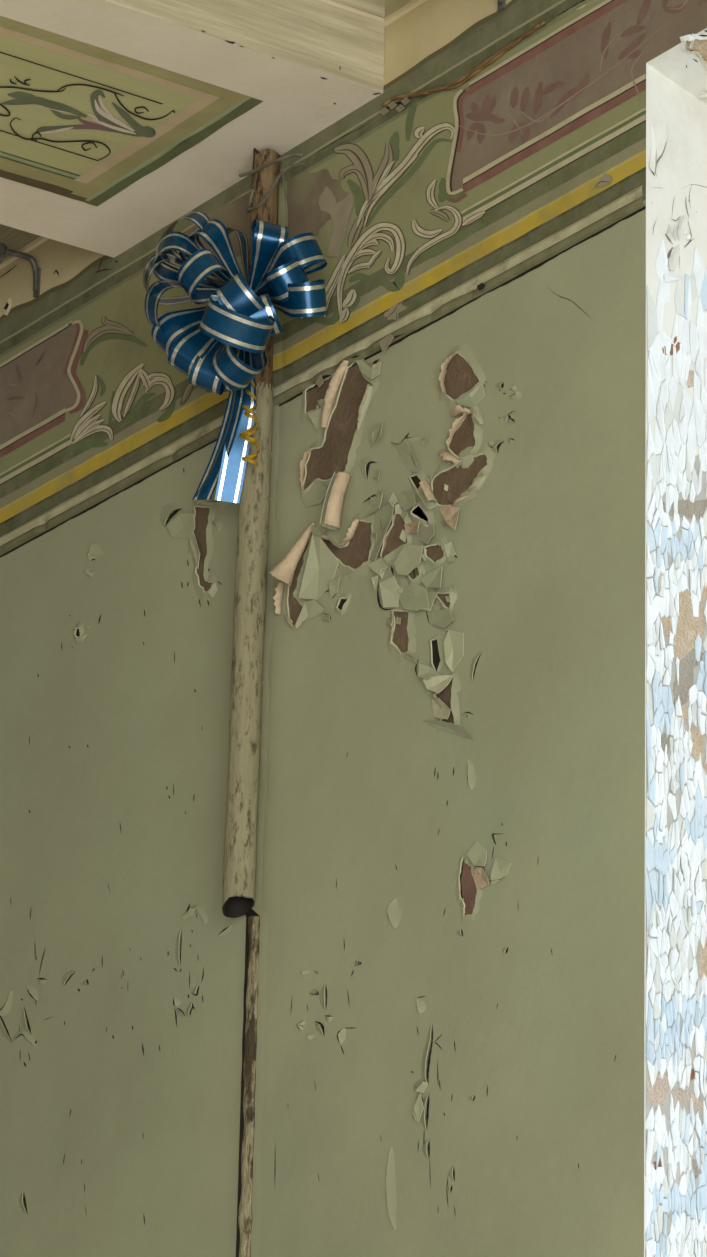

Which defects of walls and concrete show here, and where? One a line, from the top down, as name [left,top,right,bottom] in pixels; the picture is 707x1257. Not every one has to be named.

flaking render [679,30,707,97]
peeling [160,498,232,607]
peeling [269,302,496,740]
peeling [645,197,707,1257]
peeling [455,823,511,924]